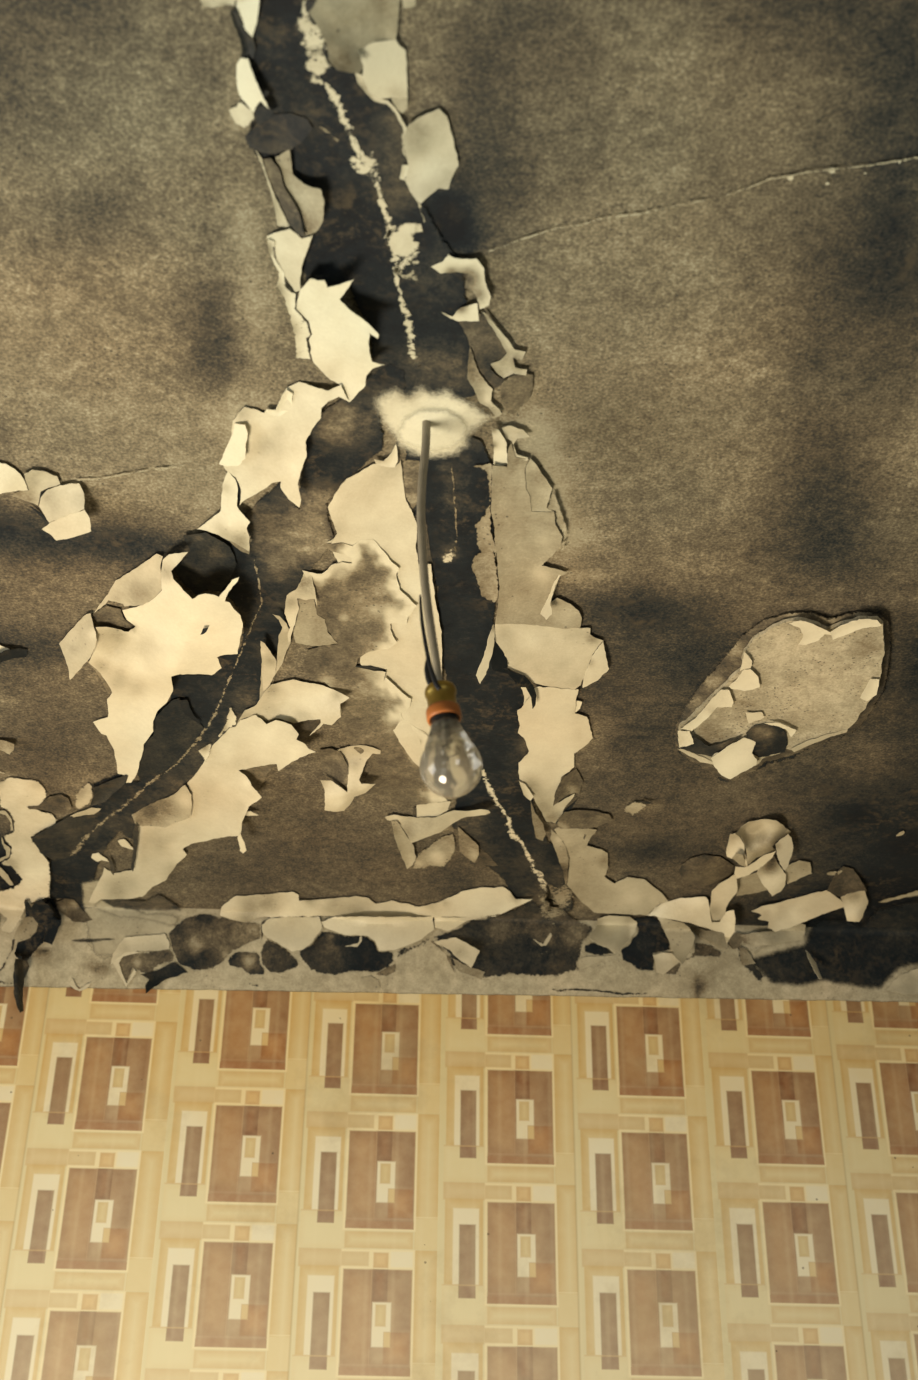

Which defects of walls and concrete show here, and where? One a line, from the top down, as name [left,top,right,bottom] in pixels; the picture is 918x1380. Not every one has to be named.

crack [297,0,423,359]
crack [488,157,918,252]
peeling [0,0,891,1013]
crack [71,560,263,856]
crack [482,770,574,925]
water stain [753,902,918,988]
crack [880,891,918,903]
peeling [887,969,918,995]